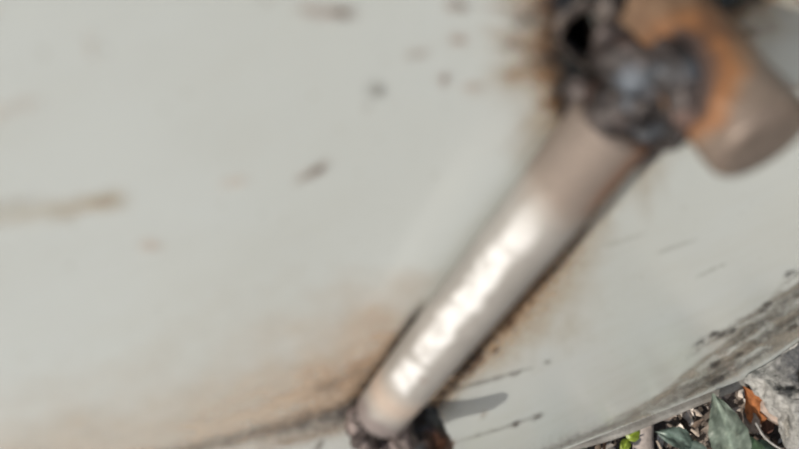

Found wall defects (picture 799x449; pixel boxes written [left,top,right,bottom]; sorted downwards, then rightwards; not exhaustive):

leakage [775,342,799,399]